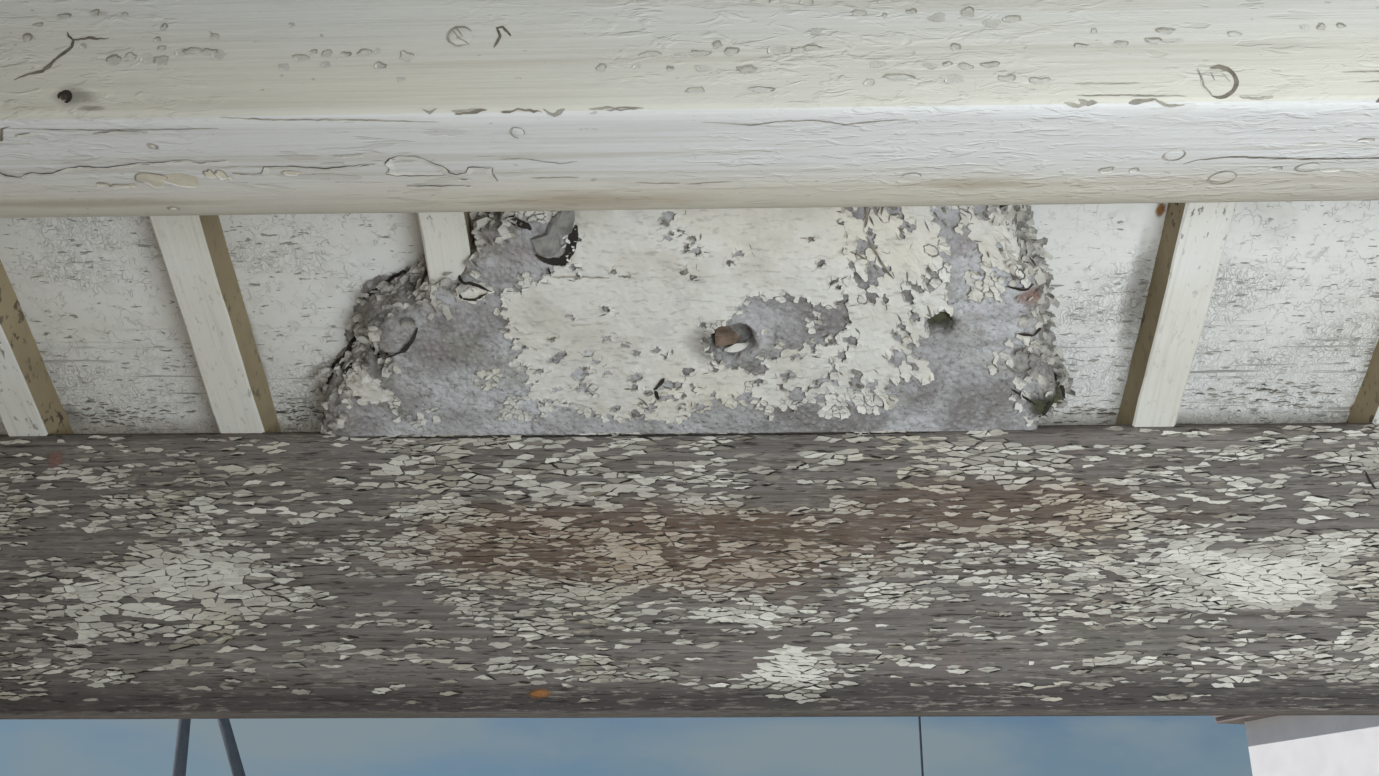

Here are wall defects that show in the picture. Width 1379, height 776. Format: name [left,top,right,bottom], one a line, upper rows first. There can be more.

crack [447,26,511,47]
crack [15,32,108,80]
crack [1076,64,1239,99]
crack [1346,70,1379,82]
crack [0,117,418,141]
crack [705,118,909,126]
crack [500,127,578,179]
crack [641,179,721,187]
crack [1163,150,1379,185]
peeling [0,205,1379,704]